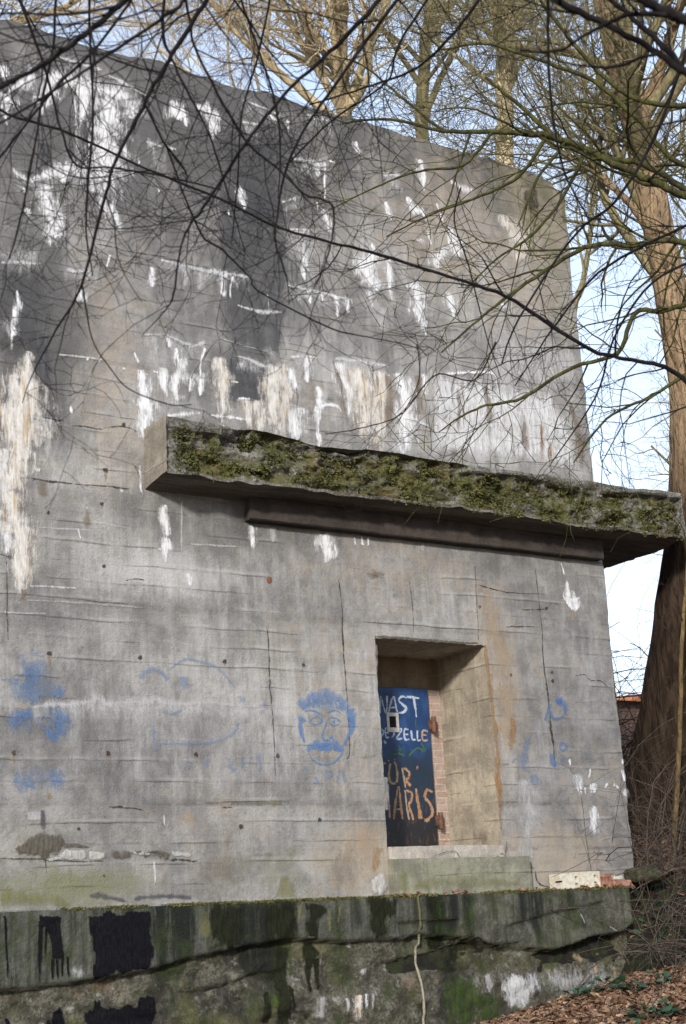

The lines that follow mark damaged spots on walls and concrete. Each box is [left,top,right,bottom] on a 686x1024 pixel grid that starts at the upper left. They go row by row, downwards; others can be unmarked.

water stain [0,57,144,245]
efflorescence [166,100,221,138]
water stain [134,144,583,464]
water stain [0,253,85,593]
crack [266,626,276,774]
crack [338,580,350,758]
rust [484,599,516,819]
crack [475,569,555,761]
water stain [39,915,63,958]
water stain [51,1007,64,1024]
efflorescence [346,994,374,1018]
water stain [444,975,538,1024]